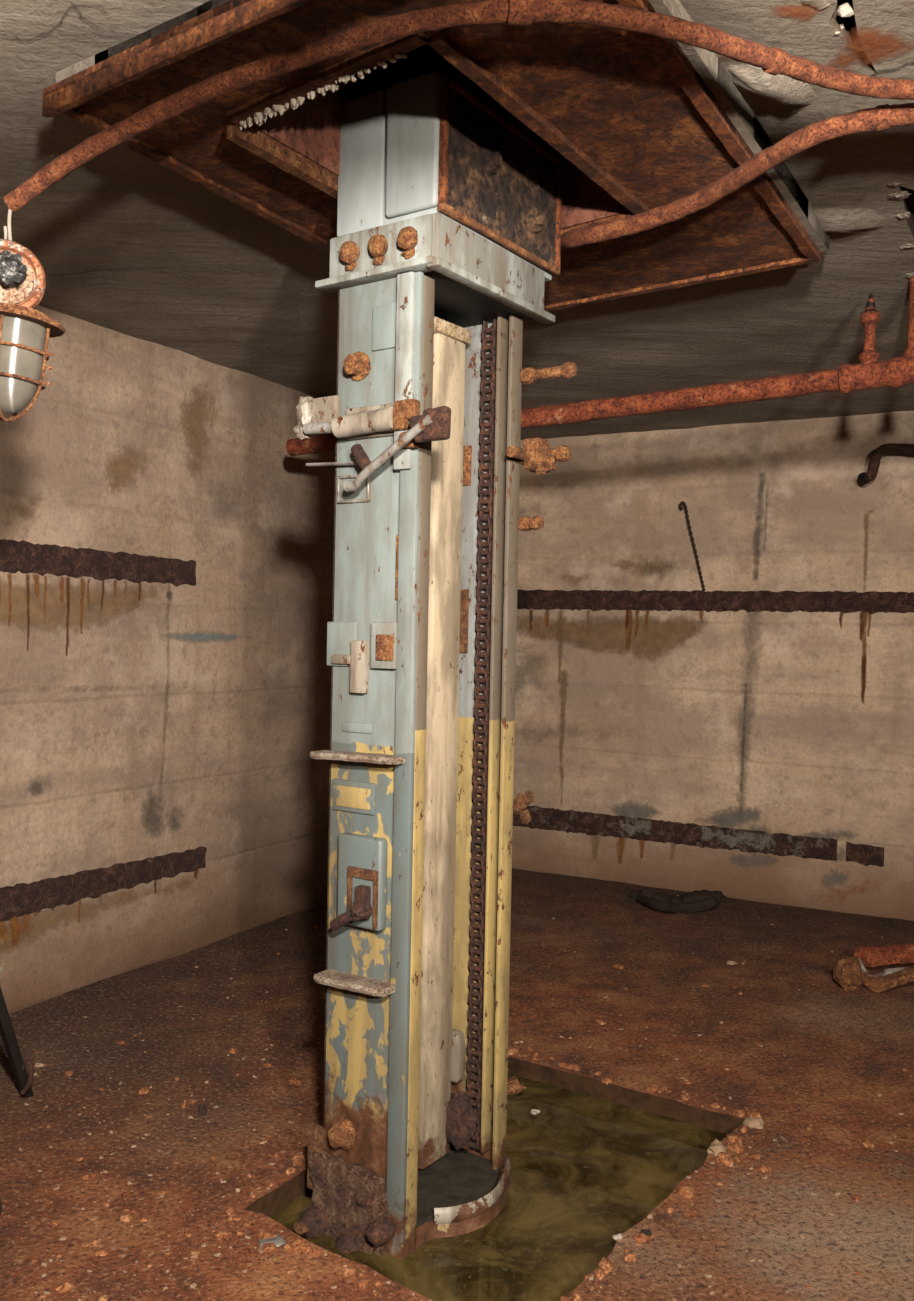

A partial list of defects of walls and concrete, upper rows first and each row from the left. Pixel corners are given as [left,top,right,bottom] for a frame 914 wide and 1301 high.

damp [754,474,763,579]
corrosion [0,574,145,656]
corrosion [517,610,703,780]
corrosion [860,612,871,701]